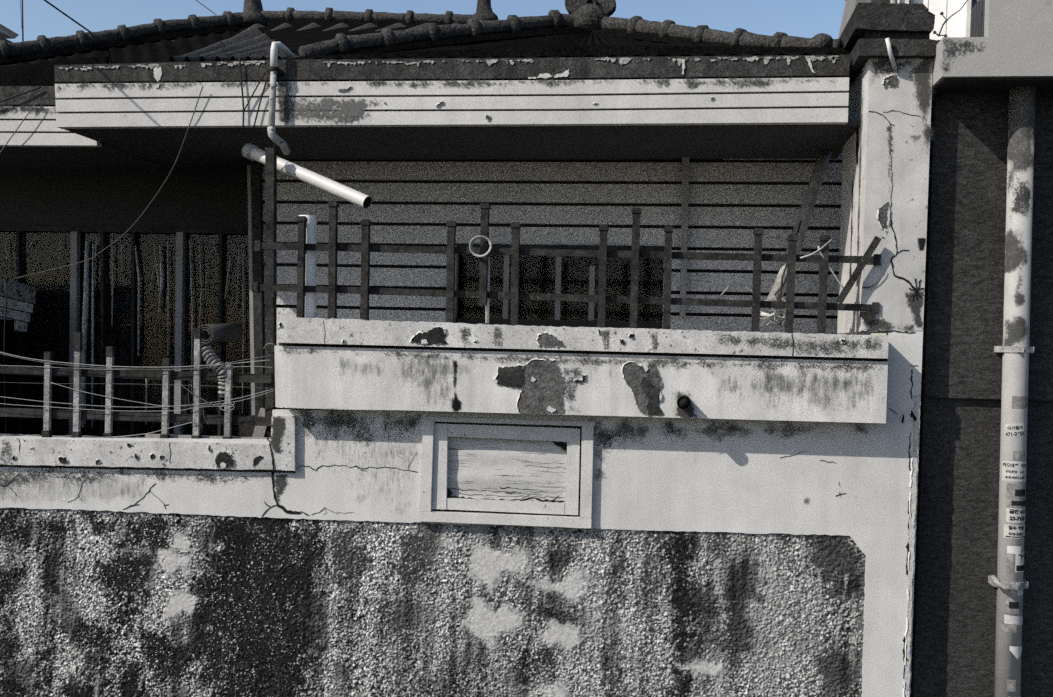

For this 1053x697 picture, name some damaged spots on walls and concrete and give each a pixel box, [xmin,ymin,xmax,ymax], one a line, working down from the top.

leakage [220,78,601,124]
peeling [668,55,839,75]
crack [869,110,924,301]
peeling [409,326,448,345]
peeling [493,332,587,415]
peeling [621,361,664,417]
leakage [385,291,924,412]
crack [861,327,915,335]
crack [123,483,169,510]
crack [261,431,416,517]
leakage [0,508,372,697]
leakage [655,531,727,697]